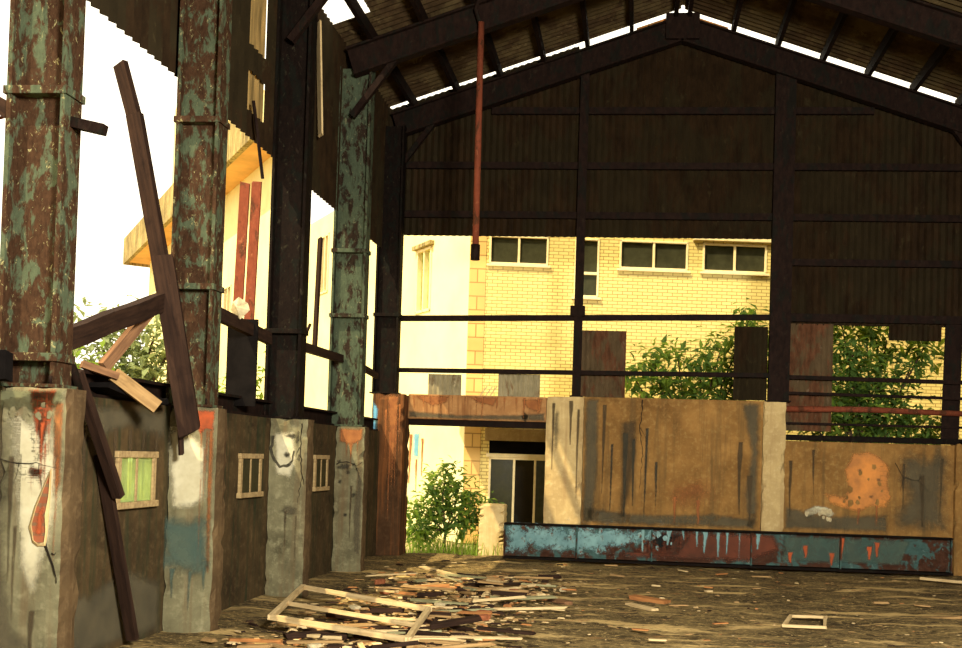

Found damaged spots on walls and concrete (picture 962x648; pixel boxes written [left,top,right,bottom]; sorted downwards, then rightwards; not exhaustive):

flaking render [1,390,62,583]
rust [28,389,63,491]
flaking render [171,429,204,506]
water stain [410,403,558,451]
water stain [569,400,759,528]
peeling [805,453,893,524]
peeling [506,524,680,554]